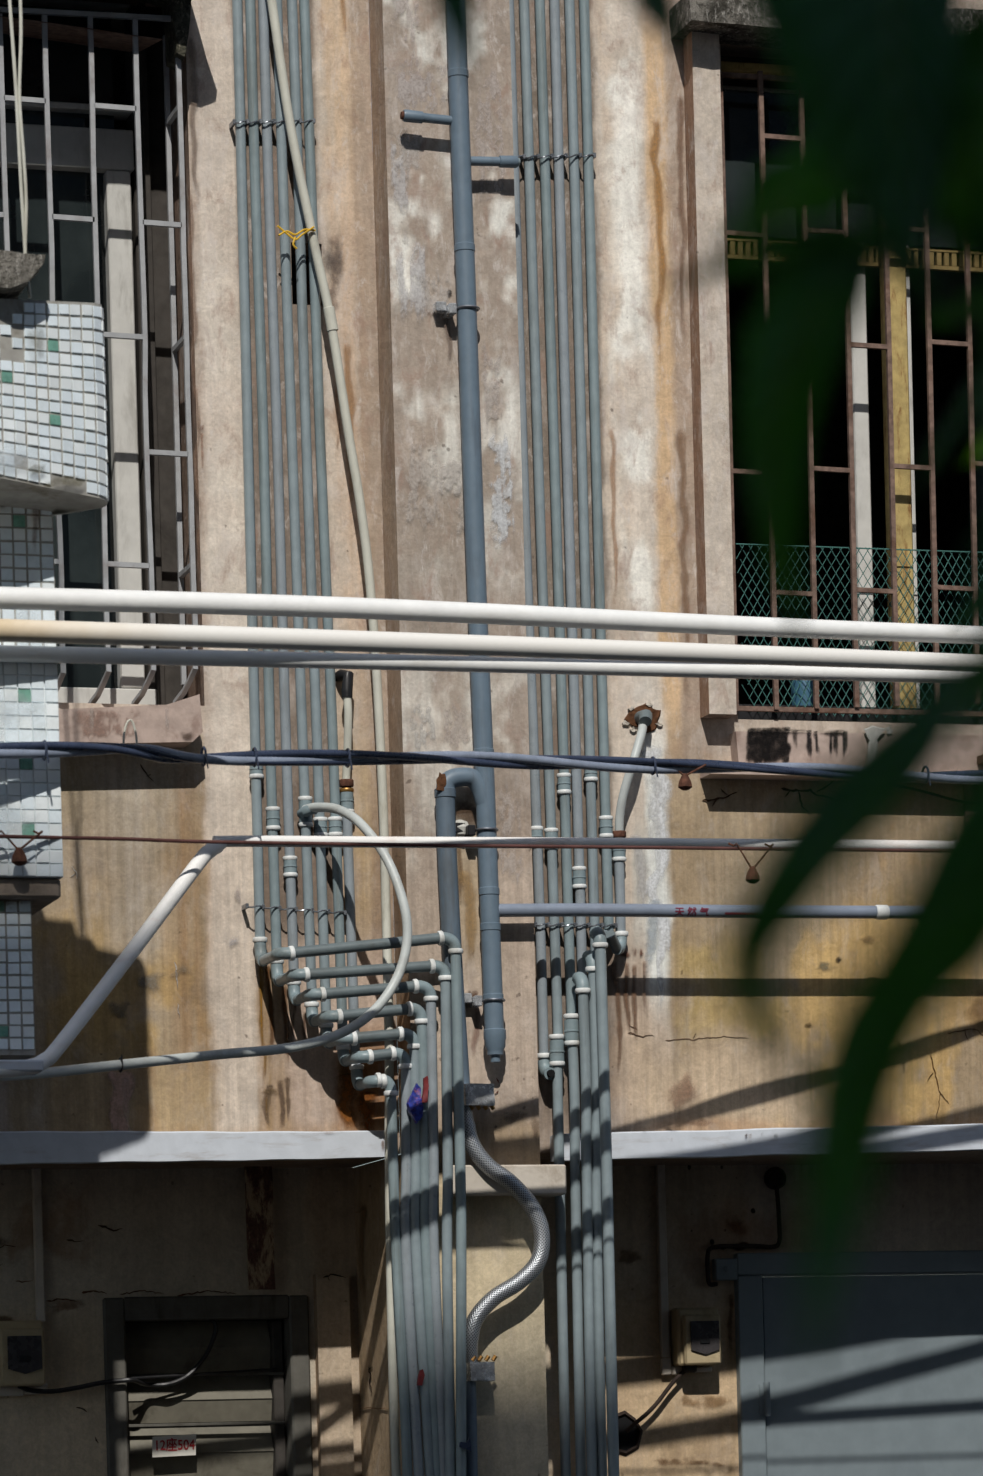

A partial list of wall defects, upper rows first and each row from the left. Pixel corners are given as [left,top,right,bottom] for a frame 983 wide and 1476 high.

peeling [489,437,514,541]
crack [929,1029,982,1116]